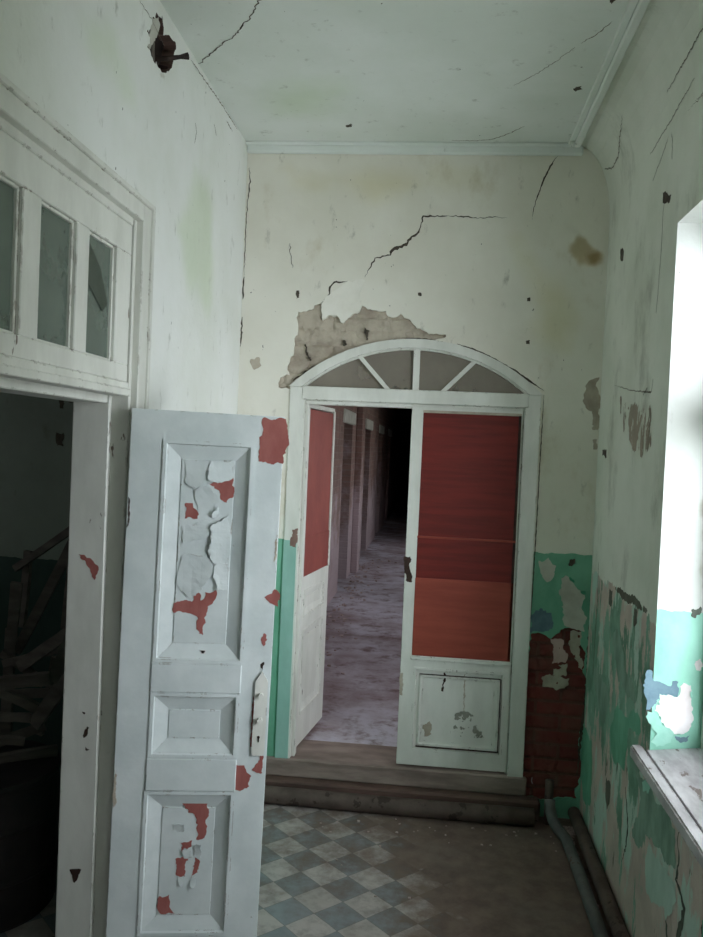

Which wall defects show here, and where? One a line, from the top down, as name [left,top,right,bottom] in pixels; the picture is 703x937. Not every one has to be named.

flaking render [147,17,189,69]
crack [191,0,260,140]
crack [532,157,557,216]
crack [328,215,507,295]
flaking render [278,279,446,389]
peeling [583,377,607,458]
peeling [609,587,647,627]
flaking render [523,558,592,806]
peeling [610,670,694,920]